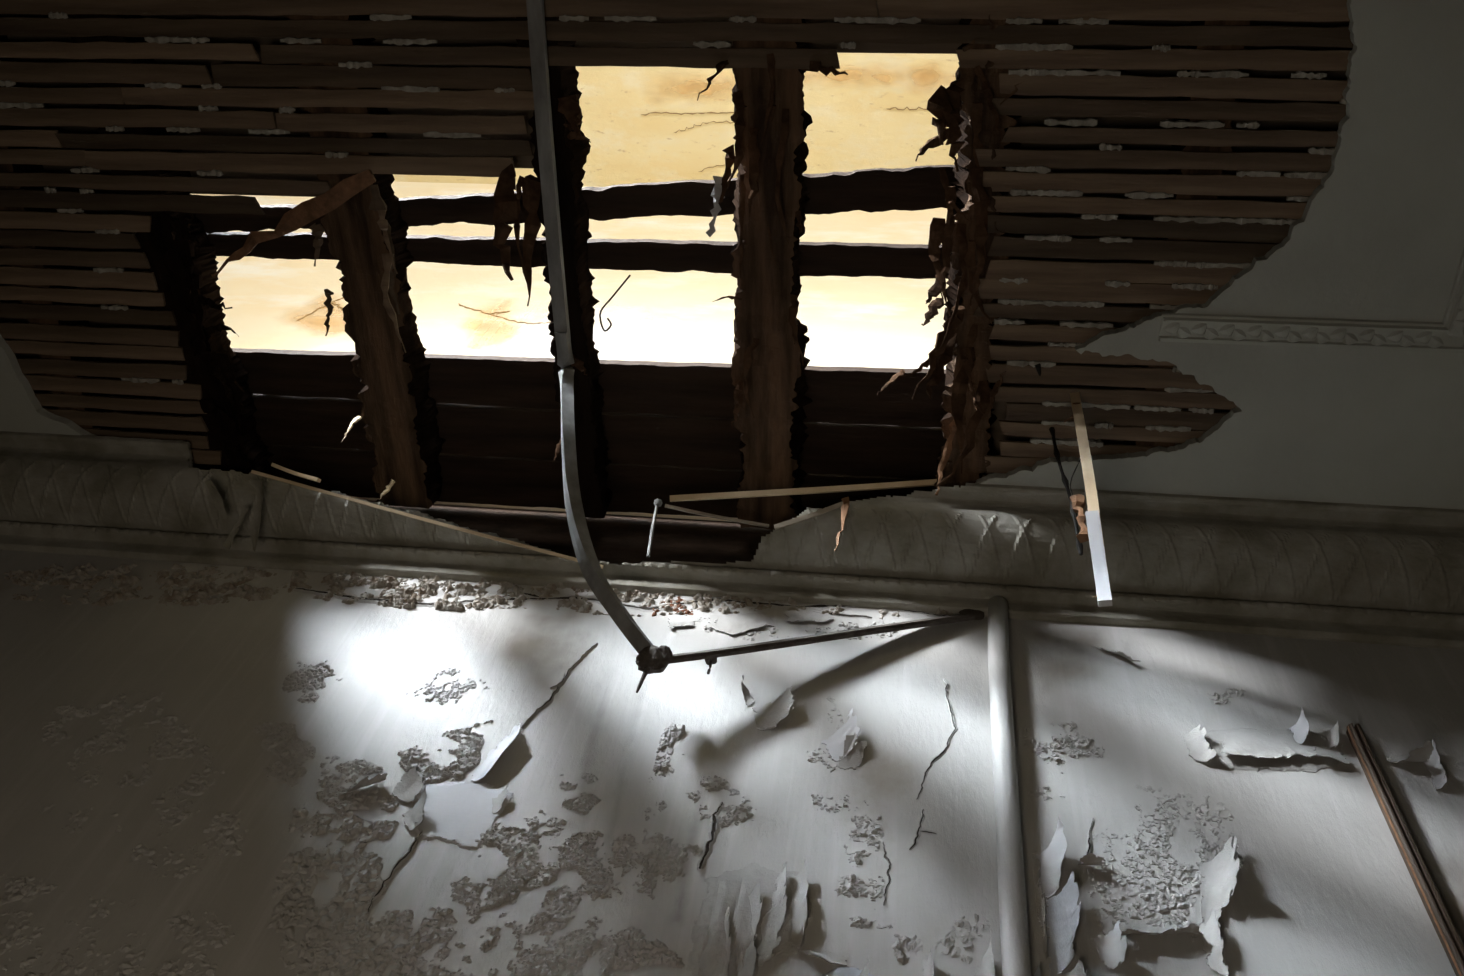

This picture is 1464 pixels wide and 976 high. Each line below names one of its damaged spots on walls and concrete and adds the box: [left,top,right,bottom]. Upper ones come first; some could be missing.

flaking render [288,570,901,641]
crack [288,586,948,619]
peeling [282,660,343,703]
peeling [405,668,490,705]
crack [521,643,598,728]
peeling [741,675,794,730]
peeling [685,775,757,828]
crack [882,679,958,905]
peeling [1182,708,1350,773]
peeling [1387,739,1447,790]
peeling [266,720,703,976]
peeling [811,794,995,976]